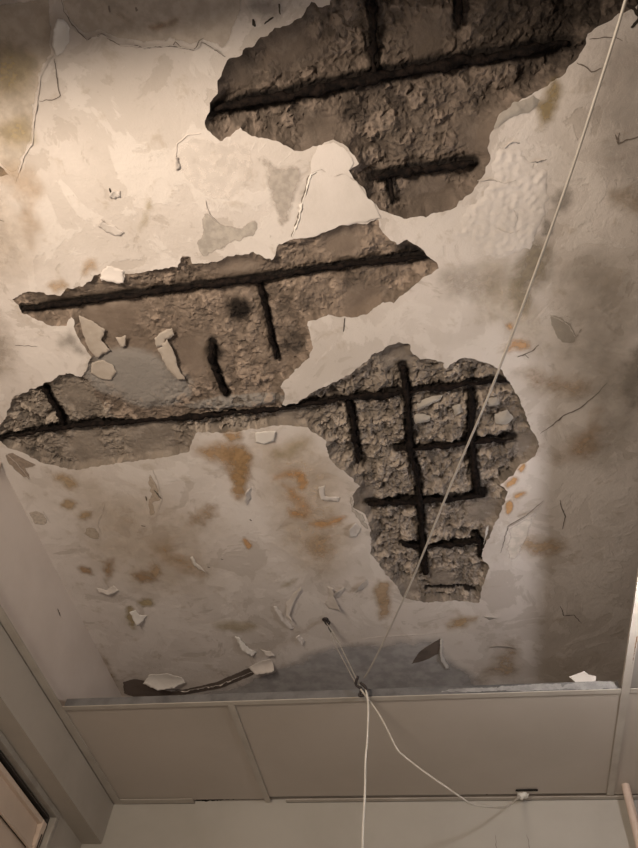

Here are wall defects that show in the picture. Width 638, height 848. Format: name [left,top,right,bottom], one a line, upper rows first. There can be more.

crack [61,0,225,57]
spalling [52,0,638,260]
peeling [550,315,582,343]
spalling [0,200,542,603]
corrosion [202,433,250,497]
peeling [129,610,146,626]
peeling [123,633,617,697]